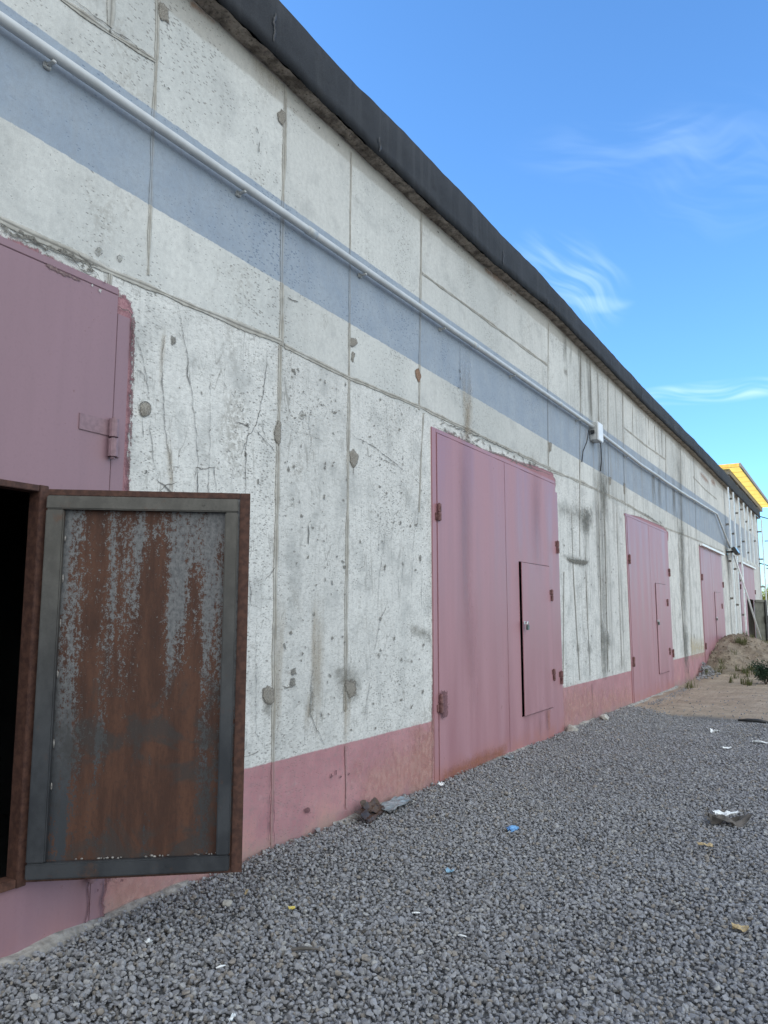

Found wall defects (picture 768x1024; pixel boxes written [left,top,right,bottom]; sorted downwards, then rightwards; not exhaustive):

crack [120,307,217,493]
crack [236,367,276,490]
corrosion [26,489,250,882]